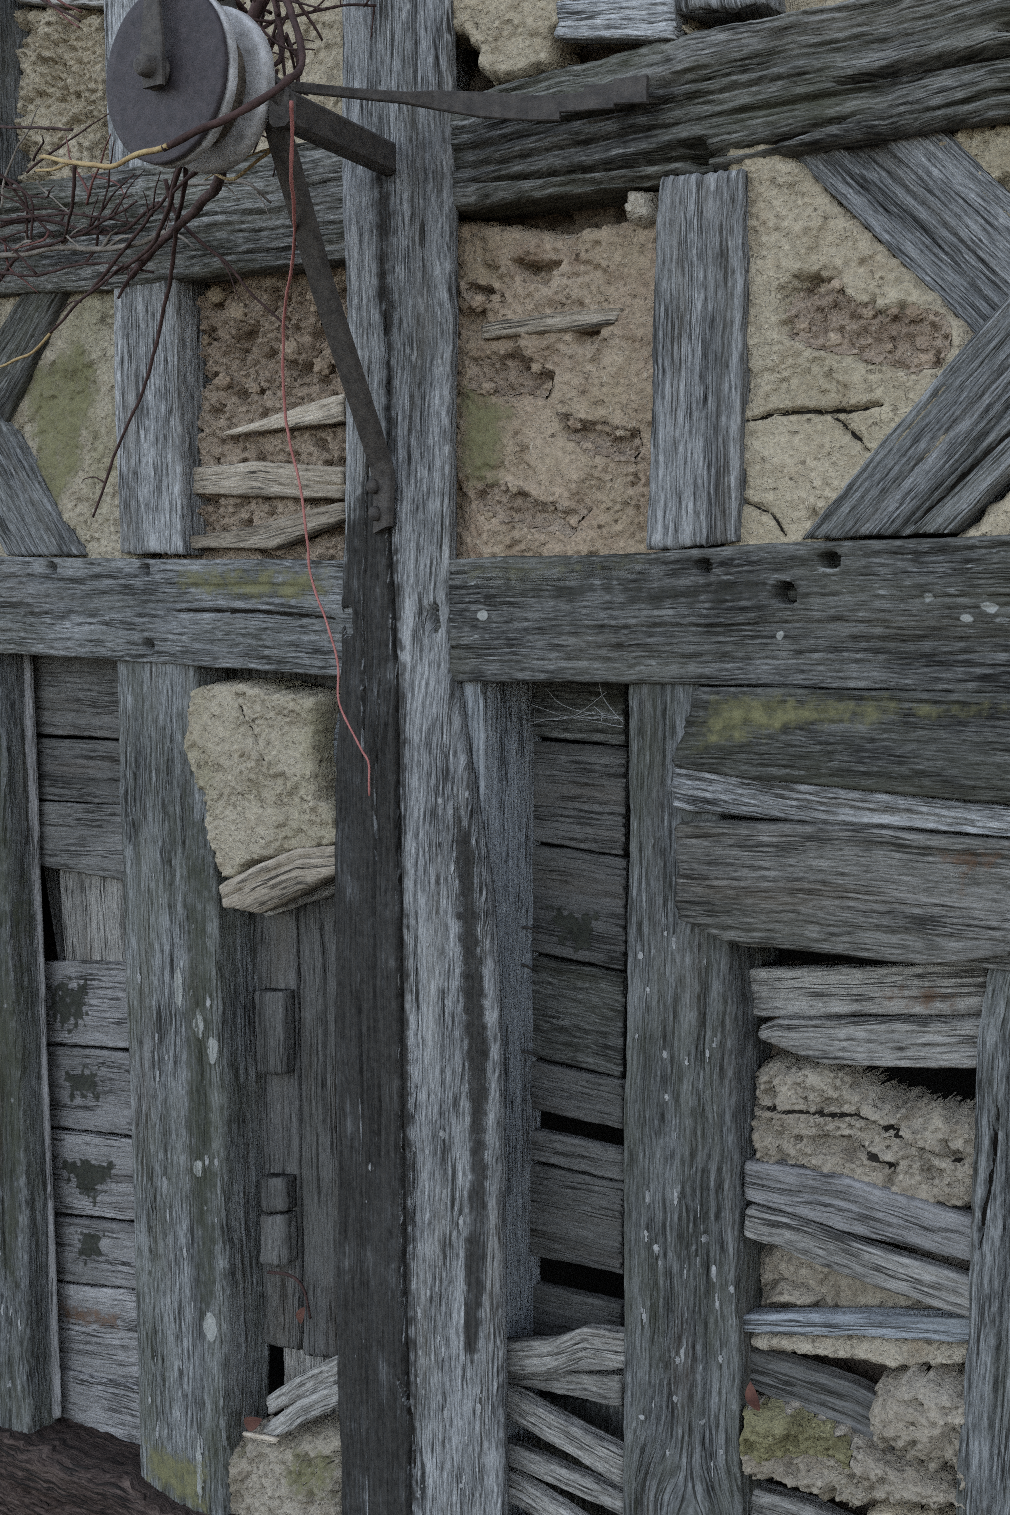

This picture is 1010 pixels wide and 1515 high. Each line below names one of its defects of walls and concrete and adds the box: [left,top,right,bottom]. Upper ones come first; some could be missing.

spalling [785,278,951,376]
crack [747,404,883,450]